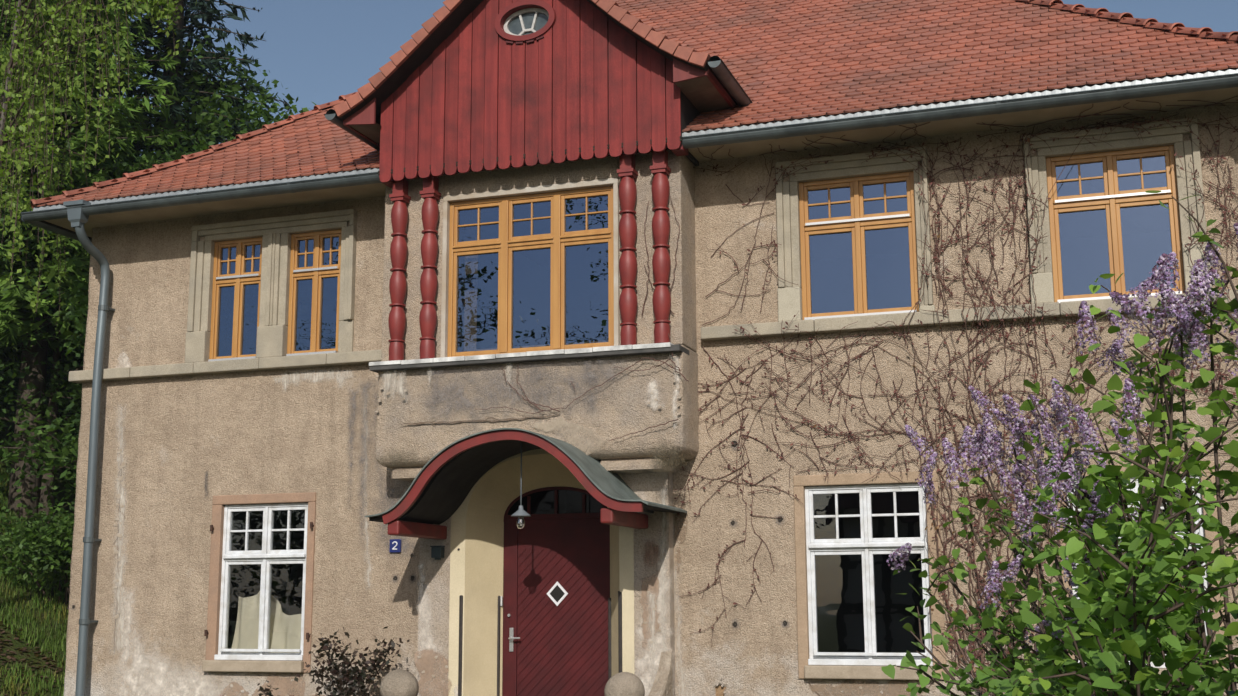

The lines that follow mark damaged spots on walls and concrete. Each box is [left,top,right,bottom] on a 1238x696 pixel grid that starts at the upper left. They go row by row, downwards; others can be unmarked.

peeling [647,355,681,424]
peeling [219,676,305,696]